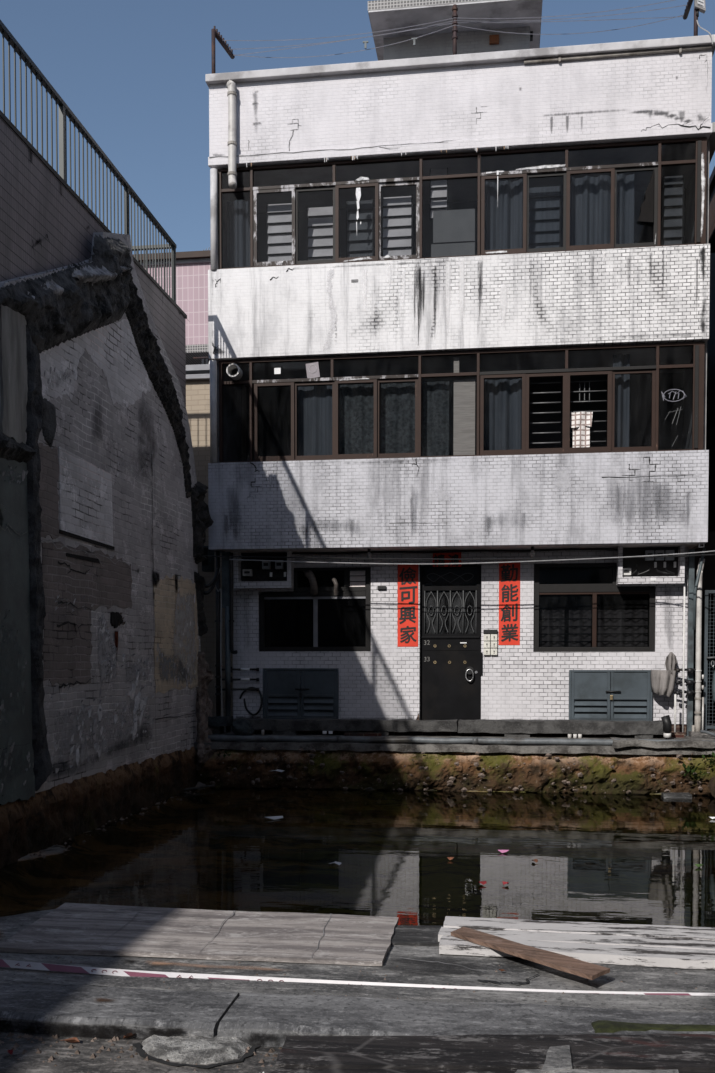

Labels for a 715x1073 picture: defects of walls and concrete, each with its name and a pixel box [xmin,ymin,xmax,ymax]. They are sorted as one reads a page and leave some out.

crack [642,118,711,130]
leakage [414,267,436,337]
crack [602,457,689,490]